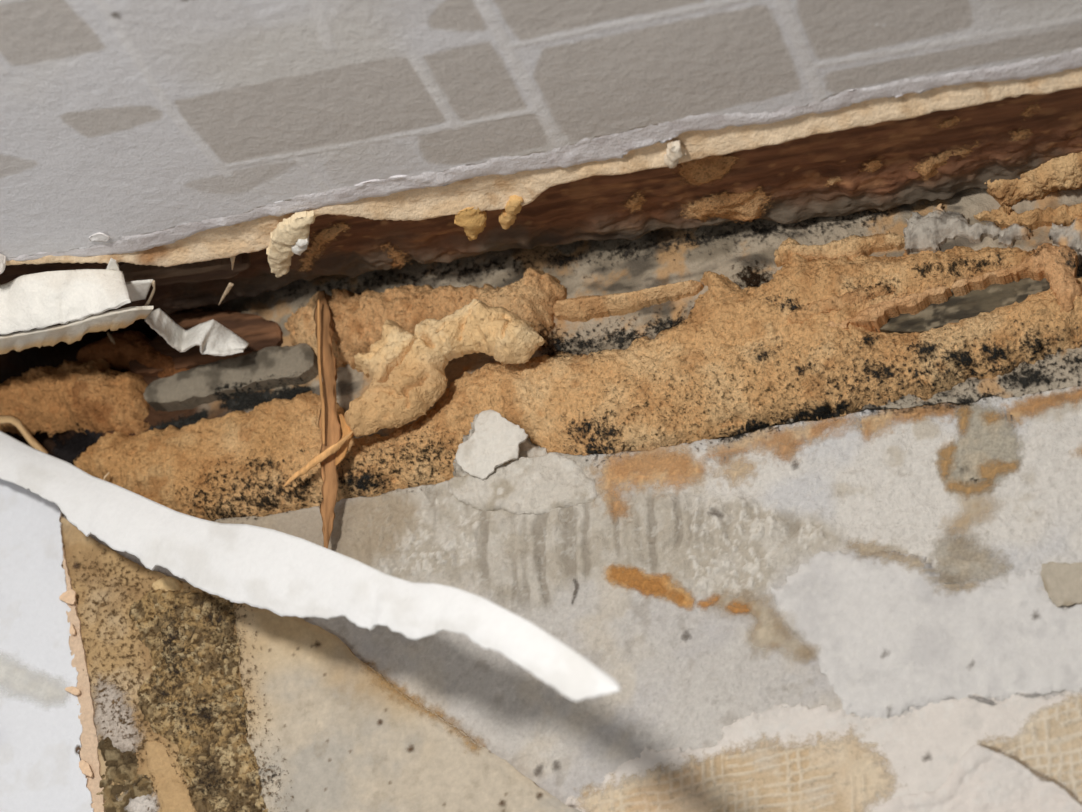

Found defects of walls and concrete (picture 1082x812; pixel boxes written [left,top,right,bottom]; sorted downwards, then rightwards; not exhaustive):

flaking render [309,67,1082,221]
flaking render [6,213,295,267]
water stain [538,301,693,358]
water stain [46,422,103,465]
water stain [171,449,323,522]
water stain [213,374,315,412]
water stain [336,426,456,496]
peeling [448,409,599,515]
water stain [555,318,1082,591]
peeling [0,431,621,812]
water stain [68,549,294,812]
peeling [565,550,1082,812]